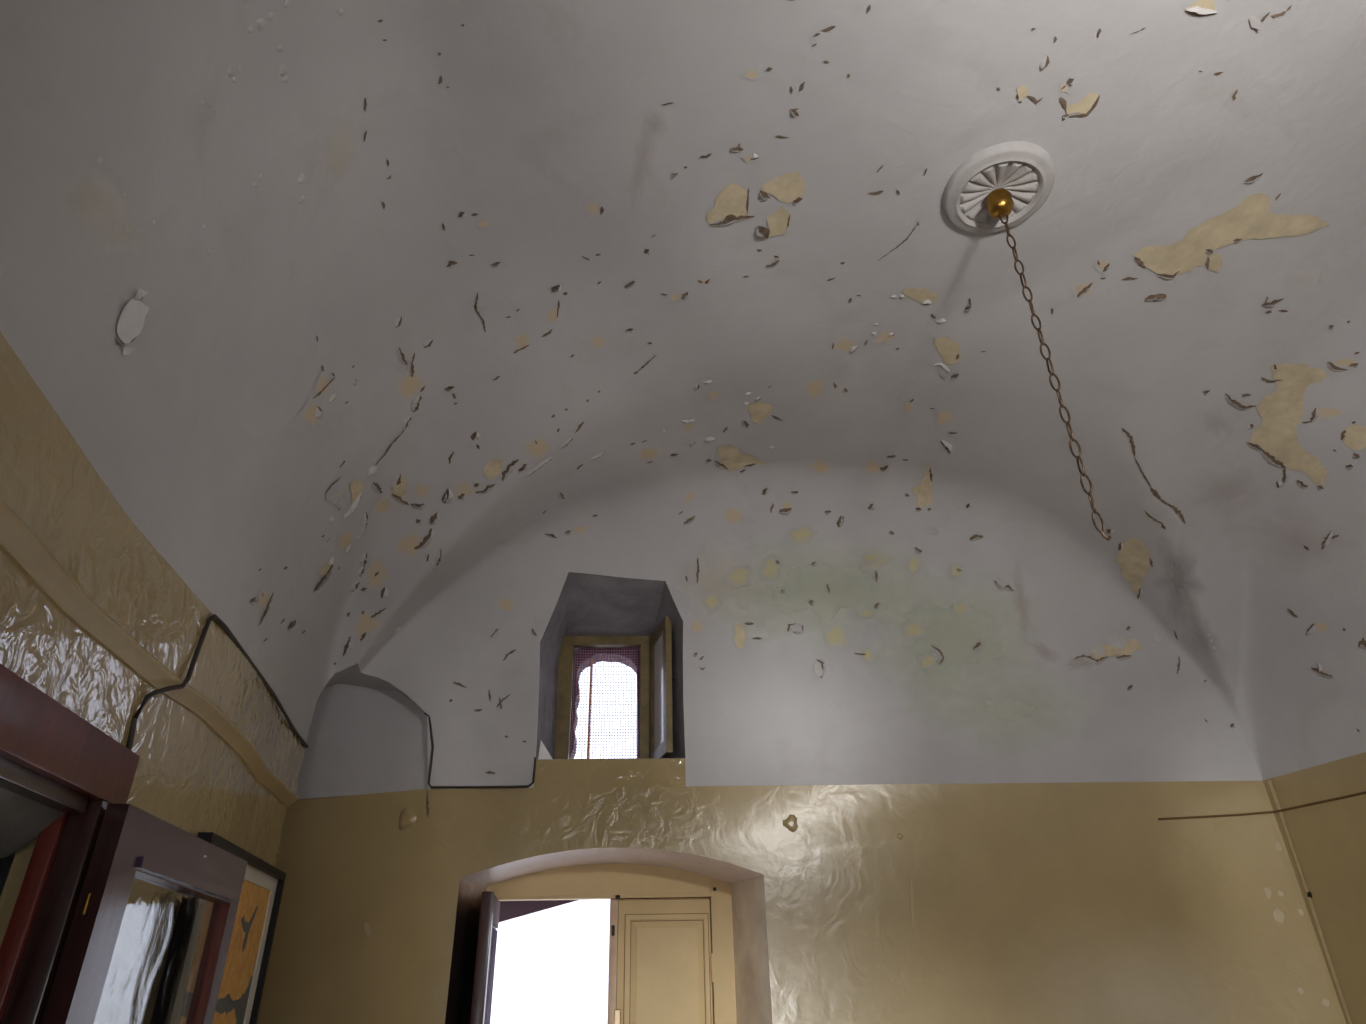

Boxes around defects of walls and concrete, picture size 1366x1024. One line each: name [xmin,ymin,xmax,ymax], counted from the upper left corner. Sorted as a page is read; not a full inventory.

peeling [1016,85,1042,104]
peeling [1039,37,1057,71]
peeling [1057,78,1100,119]
peeling [1185,0,1217,17]
peeling [706,172,806,268]
peeling [1070,173,1330,301]
peeling [891,287,962,379]
peeling [390,339,433,430]
peeling [325,408,585,577]
peeling [706,444,775,473]
peeling [1203,352,1366,491]
peeling [1107,529,1153,599]